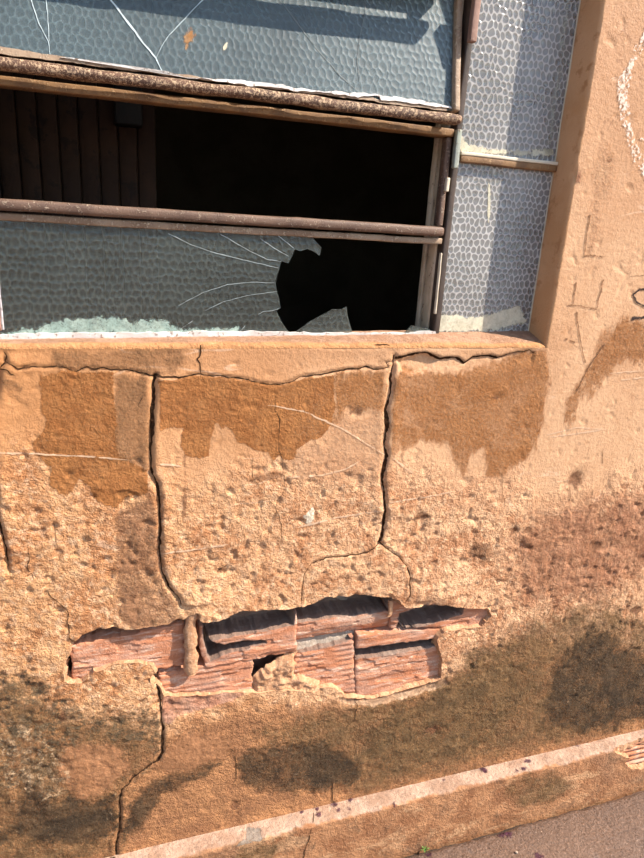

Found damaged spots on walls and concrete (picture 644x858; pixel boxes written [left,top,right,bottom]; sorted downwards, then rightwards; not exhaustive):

water stain [565,318,644,423]
crack [0,344,533,604]
flaking render [290,409,384,482]
water stain [511,500,644,603]
crack [48,593,72,641]
water stain [0,671,222,858]
crack [110,684,165,858]
water stain [236,845,277,858]
flaking render [63,594,491,724]
crack [303,743,333,858]
water stain [237,606,644,811]
flaking render [614,738,644,770]